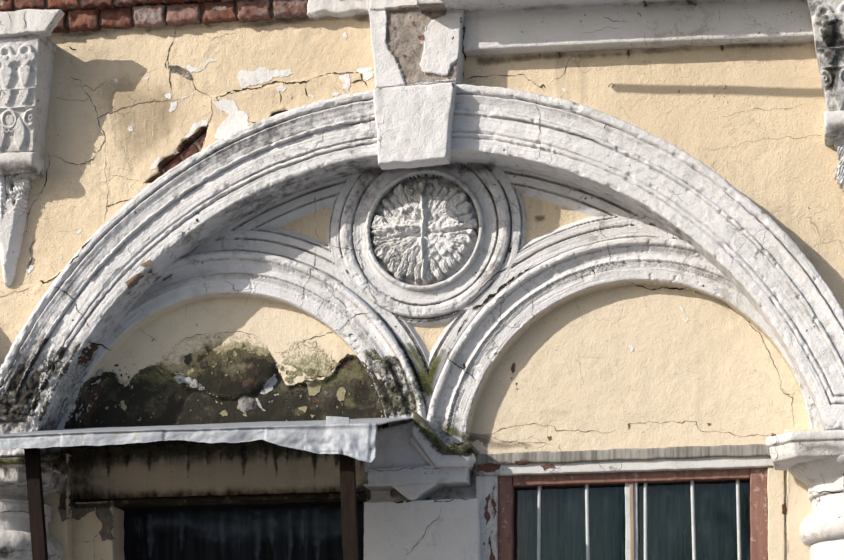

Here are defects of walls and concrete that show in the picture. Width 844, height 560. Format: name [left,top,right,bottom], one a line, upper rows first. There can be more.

peeling [237,67,292,92]
crack [192,11,571,157]
spalling [384,3,457,85]
leakage [816,13,844,95]
crack [27,28,224,226]
spalling [144,99,249,183]
crack [0,238,109,350]
leakage [0,338,82,421]
leakage [41,441,341,510]
leakage [443,427,488,455]
crack [448,261,844,560]
peeling [483,484,497,560]